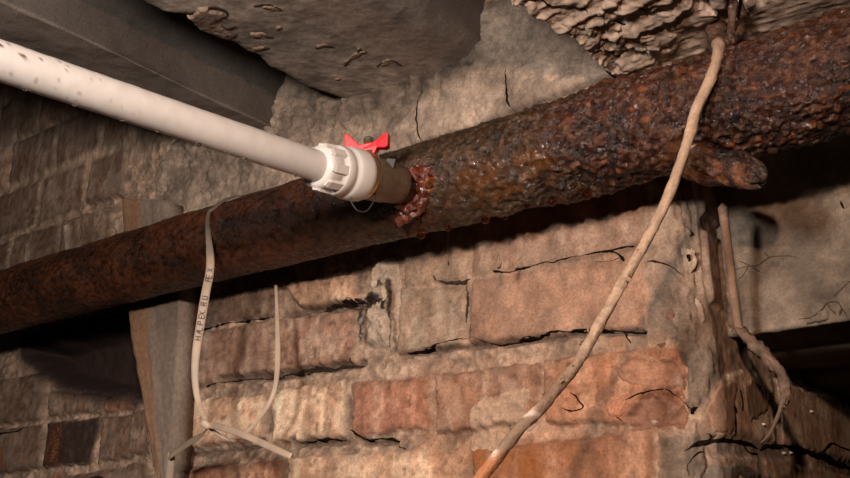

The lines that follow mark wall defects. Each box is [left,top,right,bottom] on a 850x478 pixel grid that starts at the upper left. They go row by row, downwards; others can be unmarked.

peeling [512,0,539,18]
corrosion [707,0,728,25]
spalling [550,0,694,77]
corrosion [394,165,437,227]
corrosion [447,150,552,209]
crack [493,246,634,273]
crack [648,260,682,275]
crack [316,297,370,313]
crack [407,275,647,355]
crack [617,388,697,421]
crack [685,390,850,475]